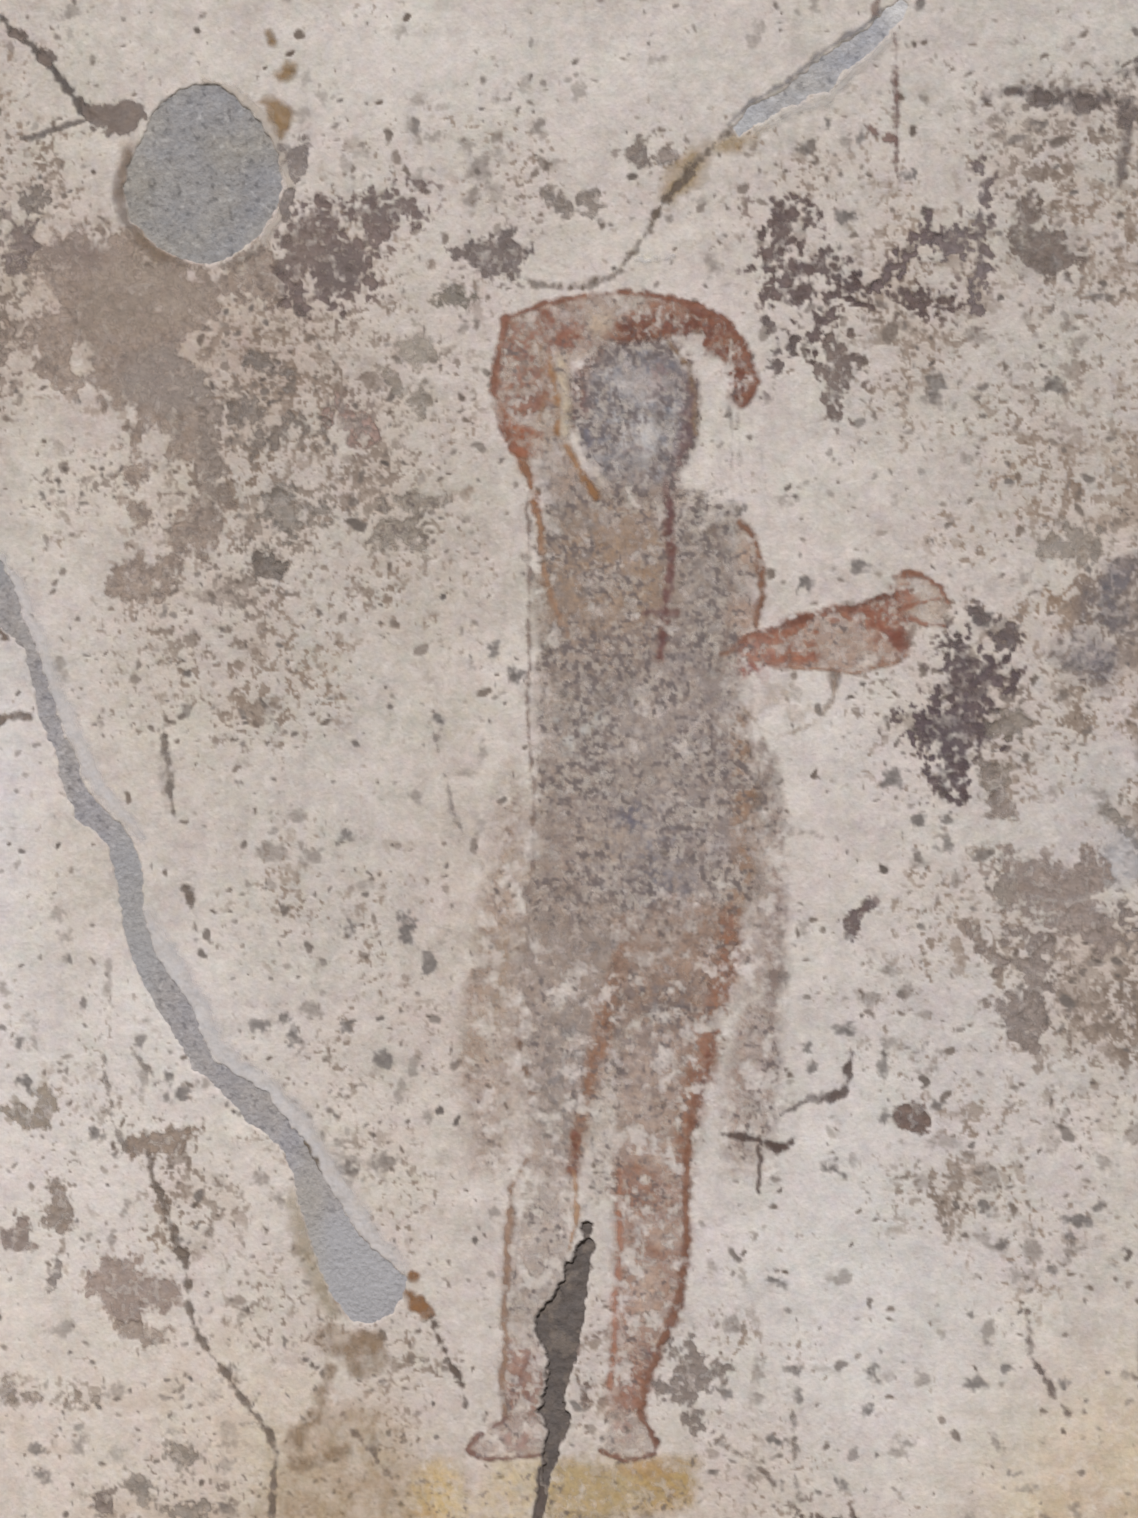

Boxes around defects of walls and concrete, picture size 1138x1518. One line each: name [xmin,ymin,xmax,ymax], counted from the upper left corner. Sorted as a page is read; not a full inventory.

peeling [0,135,437,604]
crack [0,555,407,1323]
peeling [0,1085,57,1129]
peeling [125,1127,199,1157]
peeling [1,1178,73,1251]
peeling [85,1257,181,1348]
crack [146,1152,278,1516]
crack [431,1321,467,1408]
crack [533,1467,548,1518]